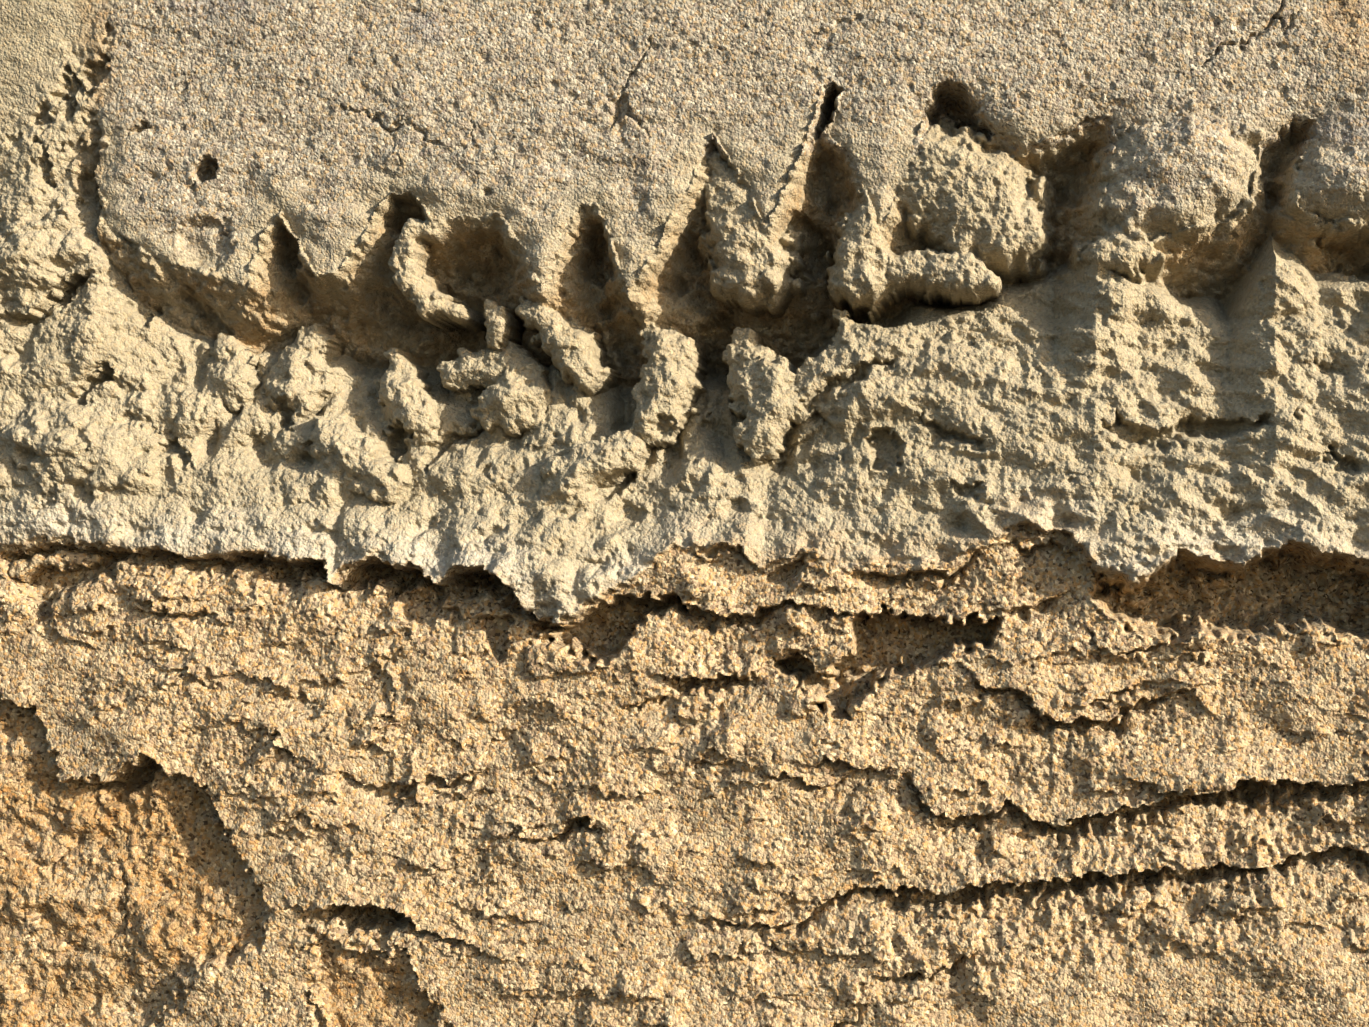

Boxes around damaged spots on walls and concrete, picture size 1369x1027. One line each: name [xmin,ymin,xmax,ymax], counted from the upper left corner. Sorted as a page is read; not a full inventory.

crack [1202,0,1301,69]
spalling [0,0,1369,748]
spalling [0,696,491,1027]
peeling [669,713,1369,1027]